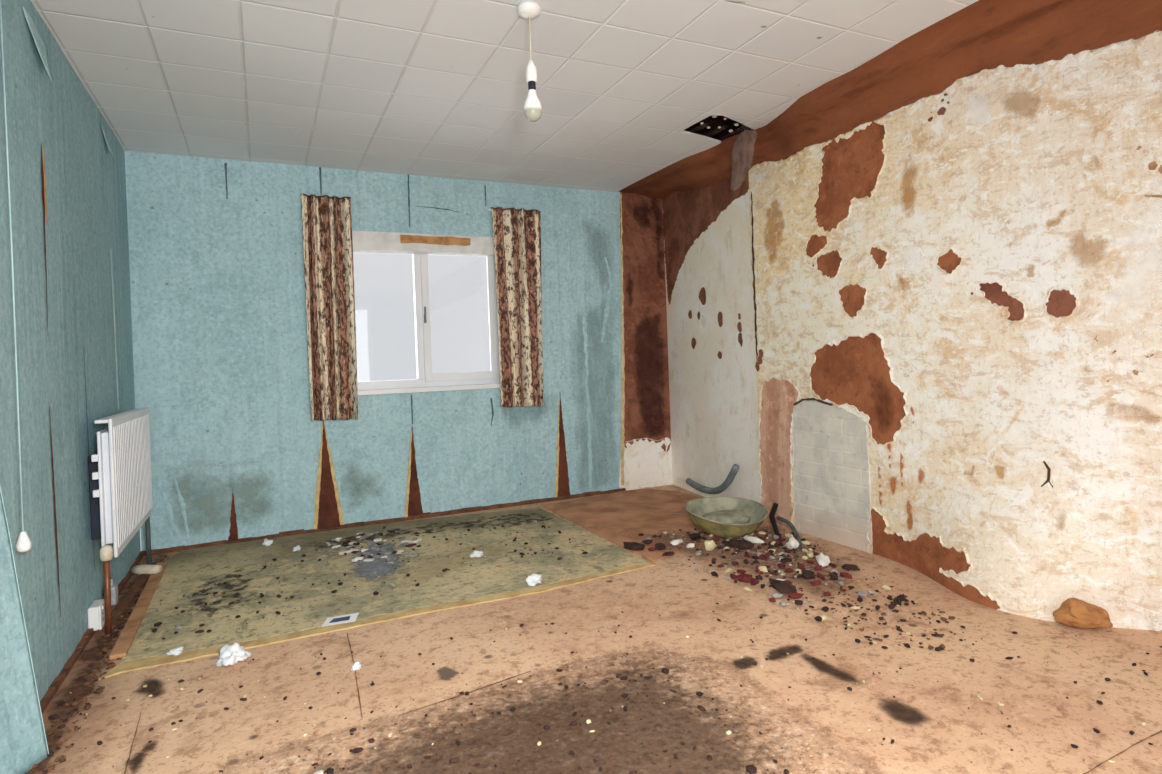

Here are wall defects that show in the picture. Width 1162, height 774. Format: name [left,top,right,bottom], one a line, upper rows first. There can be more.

flaking render [618,0,1162,490]
spalling [755,331,908,530]
spalling [867,507,1003,611]